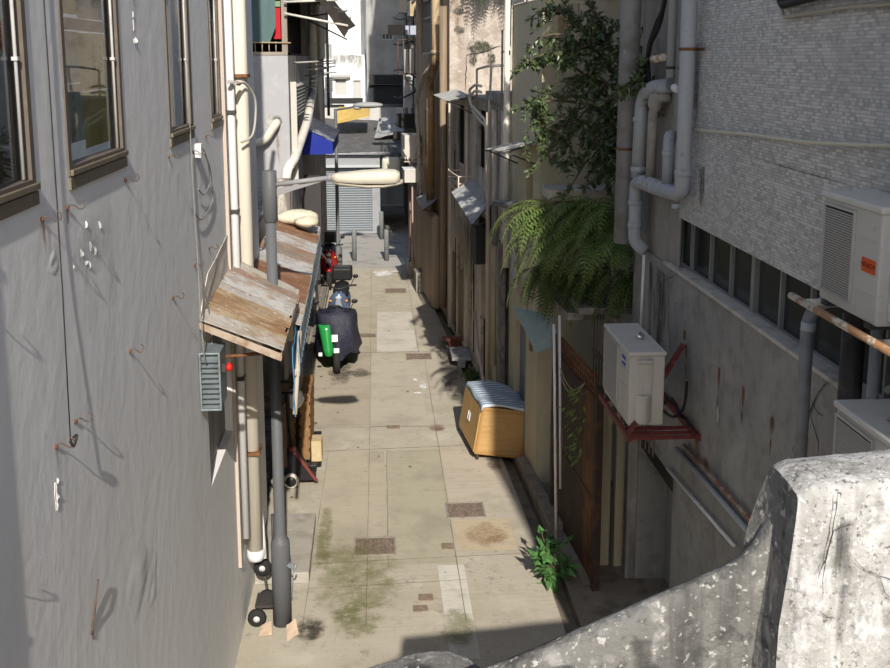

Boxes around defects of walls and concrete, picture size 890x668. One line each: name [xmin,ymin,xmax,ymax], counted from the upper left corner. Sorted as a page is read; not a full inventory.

crack [786,382,827,475]
crack [792,493,852,619]